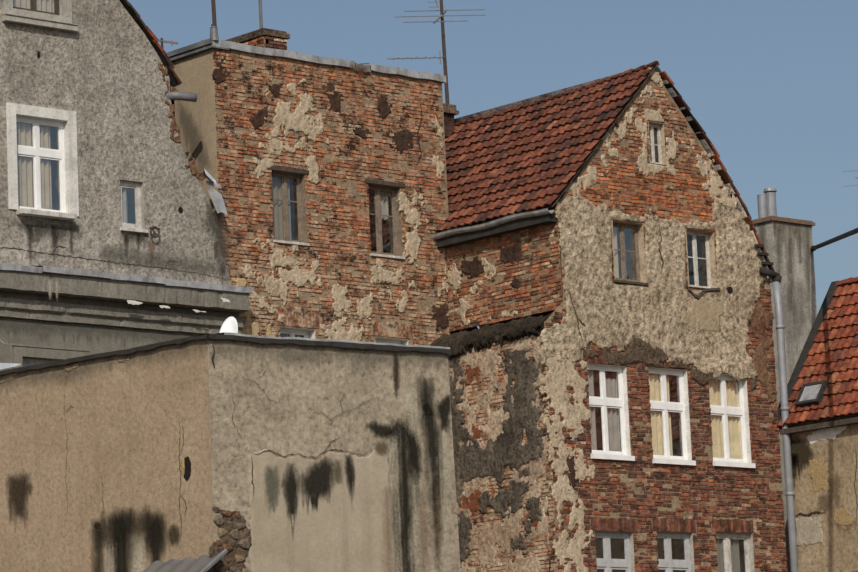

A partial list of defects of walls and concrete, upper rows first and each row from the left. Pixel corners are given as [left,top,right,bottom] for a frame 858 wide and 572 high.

peeling [596,68,663,174]
damp [21,224,77,257]
peeling [331,284,374,320]
spalling [432,241,524,331]
damp [8,475,32,519]
damp [93,511,179,572]
crack [178,422,187,542]
spalling [209,506,252,572]
crack [232,393,378,500]
damp [266,455,355,526]
damp [368,355,450,572]
peeling [449,349,548,568]